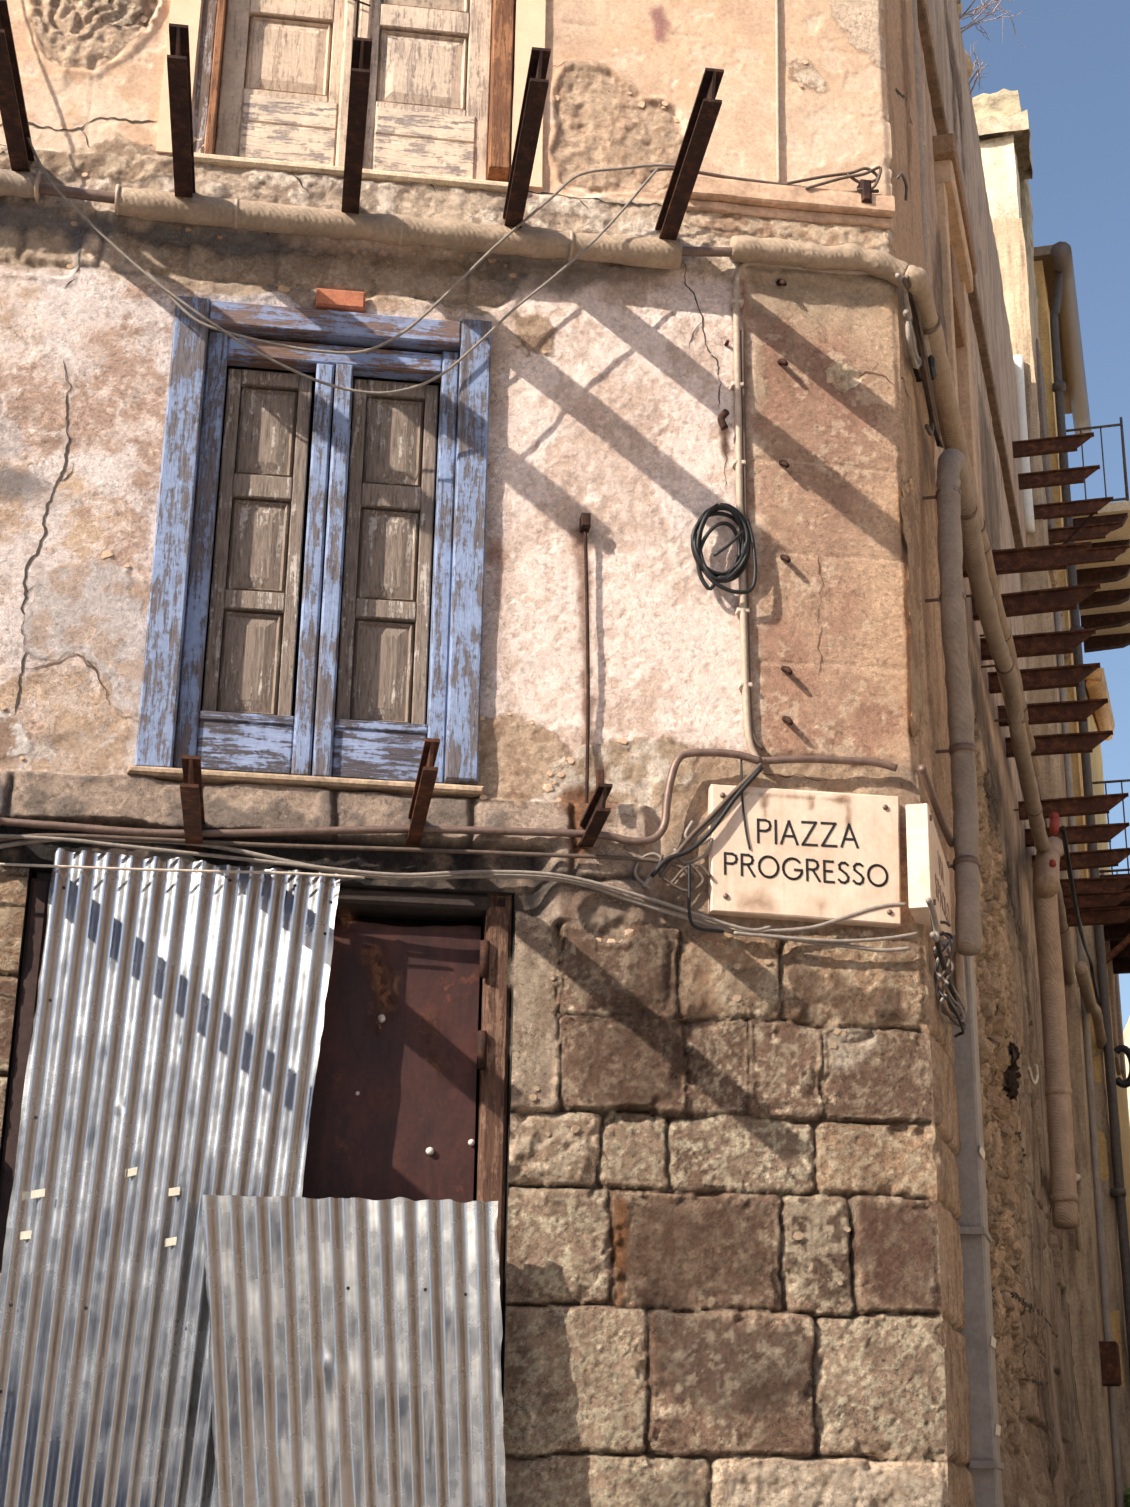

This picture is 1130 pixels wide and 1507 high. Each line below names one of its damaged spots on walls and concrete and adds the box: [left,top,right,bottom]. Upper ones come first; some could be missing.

flaking render [28,0,154,70]
flaking render [830,0,886,71]
flaking render [0,133,173,181]
flaking render [552,59,683,195]
crack [15,360,111,713]
flaking render [477,712,698,820]